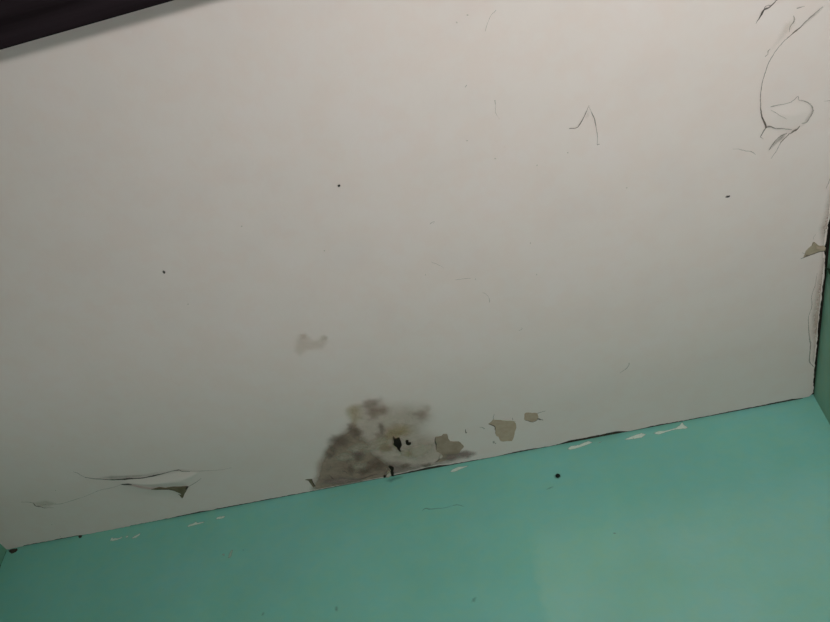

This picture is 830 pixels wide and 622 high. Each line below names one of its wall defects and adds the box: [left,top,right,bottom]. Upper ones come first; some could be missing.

crack [136,219,830,525]
damp [315,426,426,490]
peeling [435,434,464,462]
peeling [489,411,544,442]